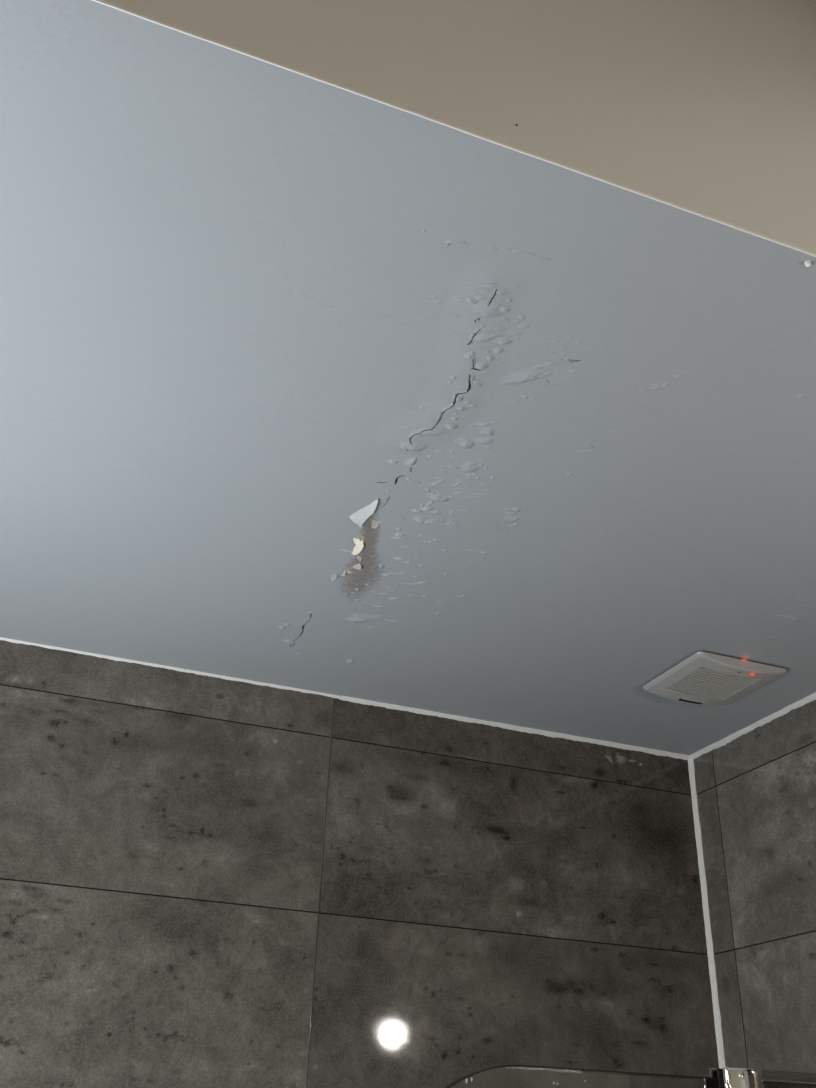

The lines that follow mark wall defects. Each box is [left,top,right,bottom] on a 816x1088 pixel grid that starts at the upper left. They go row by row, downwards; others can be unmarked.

crack [377,289,497,504]
peeling [330,499,381,582]